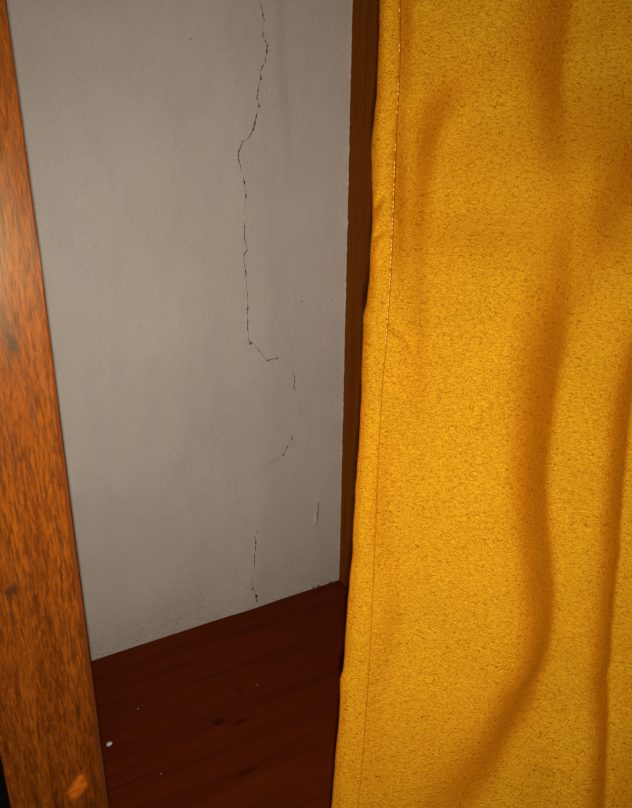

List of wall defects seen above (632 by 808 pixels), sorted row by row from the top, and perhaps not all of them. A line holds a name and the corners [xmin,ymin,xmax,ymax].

crack [237,4,302,414]
crack [246,530,258,604]